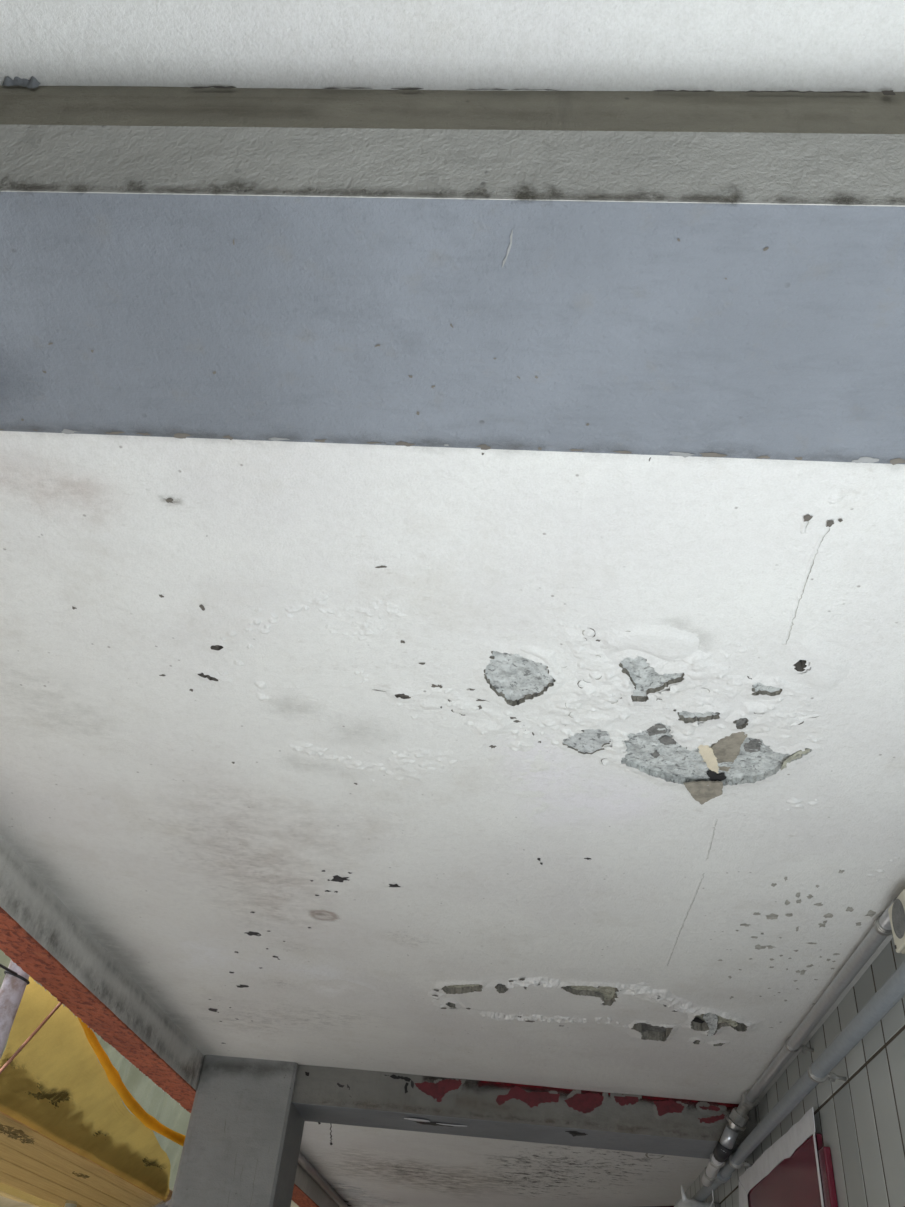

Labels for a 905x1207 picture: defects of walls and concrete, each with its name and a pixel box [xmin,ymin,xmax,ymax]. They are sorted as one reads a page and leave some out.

crack [781,525,830,646]
spalling [464,636,575,723]
spalling [532,649,826,805]
spalling [428,977,510,1010]
spalling [559,978,631,1006]
spalling [621,996,781,1046]
peeling [415,1078,466,1102]
peeling [496,1086,730,1127]